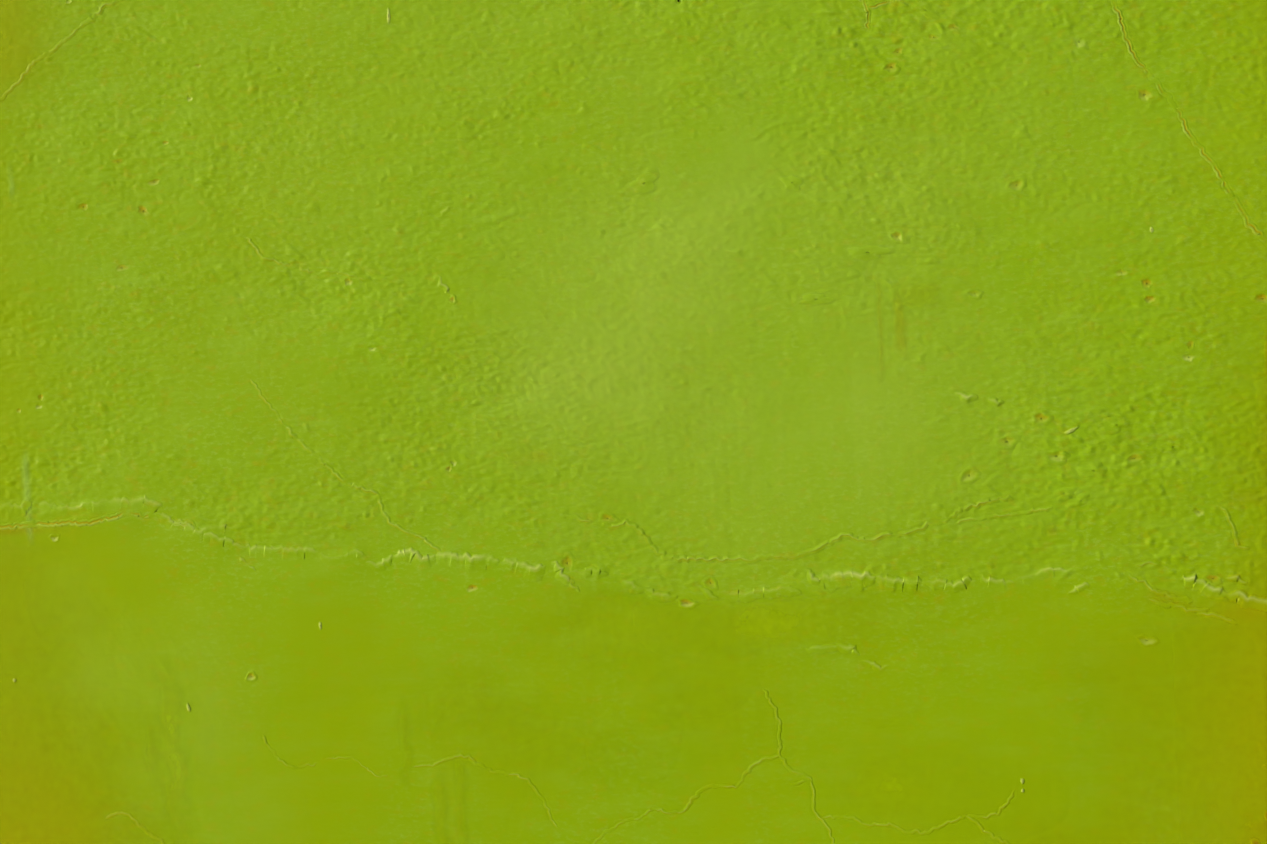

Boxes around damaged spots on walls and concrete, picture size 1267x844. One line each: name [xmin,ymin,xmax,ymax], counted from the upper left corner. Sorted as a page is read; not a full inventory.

flaking render [366,546,580,593]
flaking render [805,567,1092,595]
flaking render [1180,573,1267,612]
crack [262,735,558,828]
crack [592,688,1014,844]